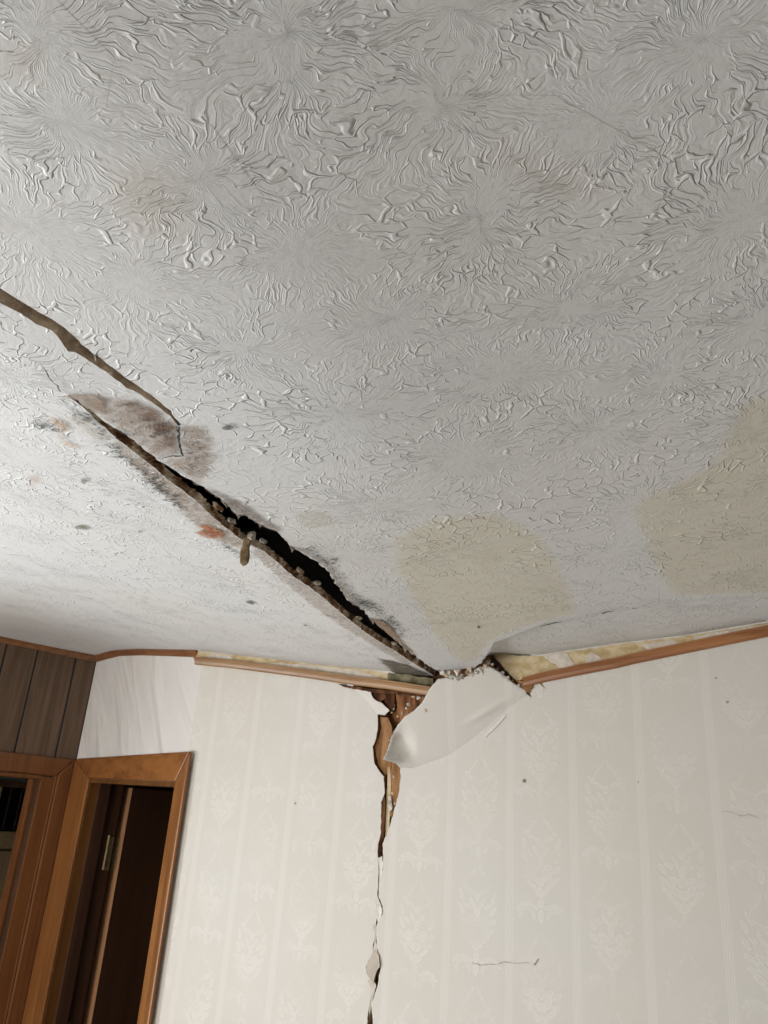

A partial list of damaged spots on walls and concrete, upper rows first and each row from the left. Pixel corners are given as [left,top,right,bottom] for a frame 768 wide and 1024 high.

damp [68,395,242,557]
corrosion [197,525,224,539]
crack [0,288,436,676]
damp [208,491,594,677]
damp [608,376,768,603]
crack [366,856,383,1024]